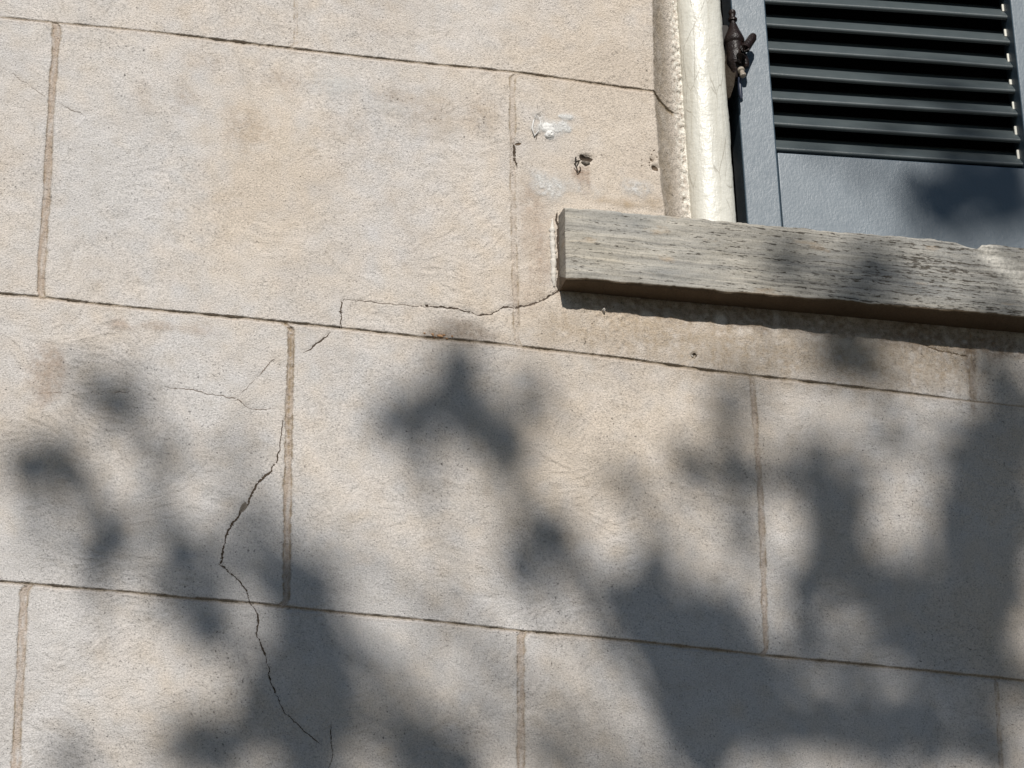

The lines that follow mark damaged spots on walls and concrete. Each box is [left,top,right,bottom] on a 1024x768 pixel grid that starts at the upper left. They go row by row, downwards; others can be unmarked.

crack [305,213,560,352]
crack [165,359,333,766]